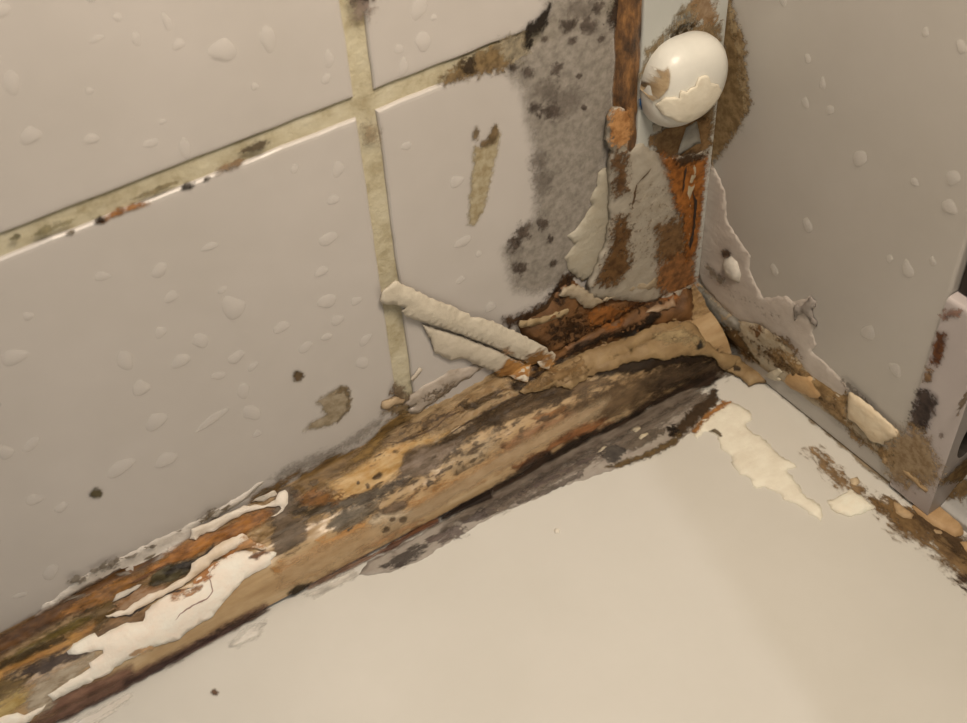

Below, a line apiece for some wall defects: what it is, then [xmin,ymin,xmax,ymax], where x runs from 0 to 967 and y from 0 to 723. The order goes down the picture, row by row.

water stain [34,219,75,236]
water stain [94,140,269,224]
water stain [438,0,618,329]
peeling [380,106,900,445]
peeling [692,401,875,521]
peeling [35,469,302,616]
peeling [0,533,276,723]